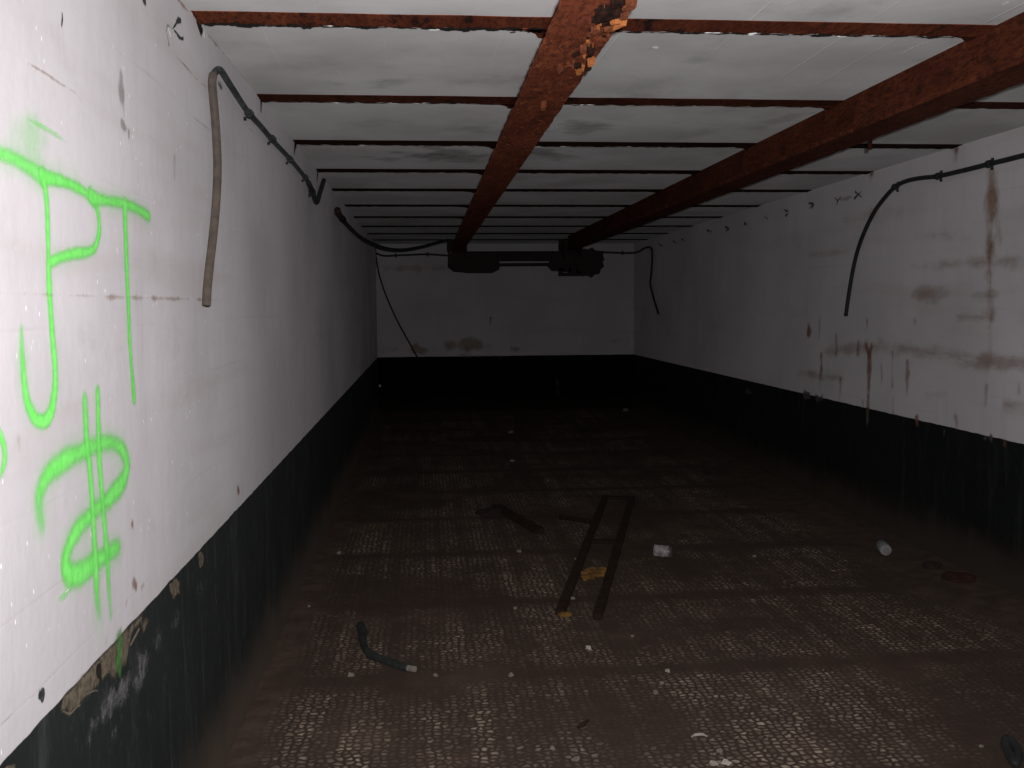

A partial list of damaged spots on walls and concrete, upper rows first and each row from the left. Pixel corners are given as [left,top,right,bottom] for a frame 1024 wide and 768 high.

rust [556,0,637,76]
rust [988,184,996,217]
rust [865,344,873,424]
peeling [61,616,148,715]